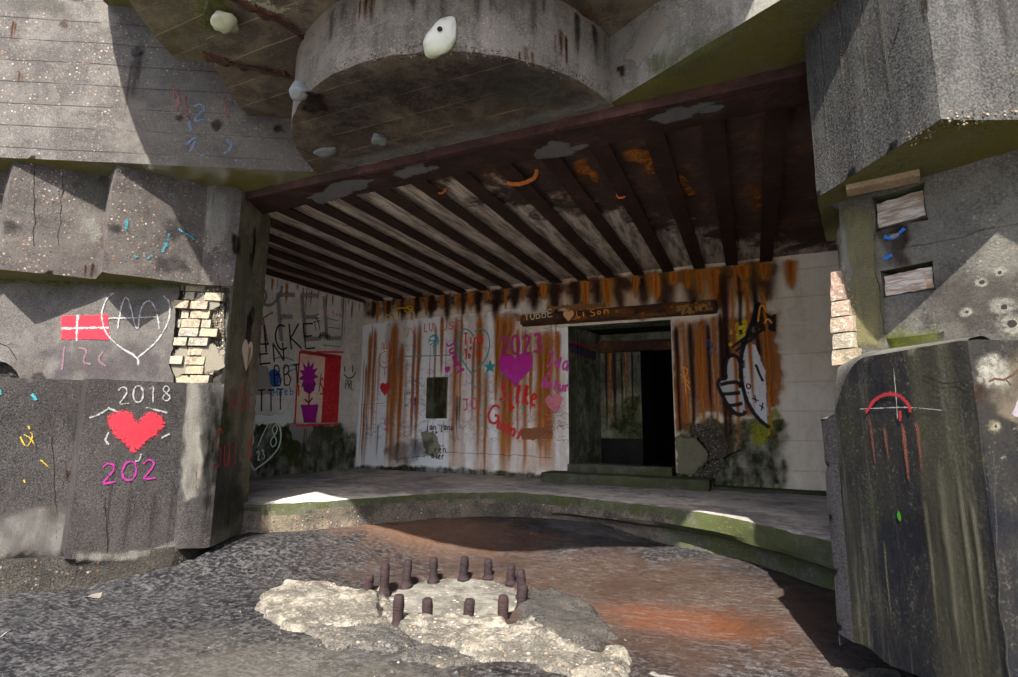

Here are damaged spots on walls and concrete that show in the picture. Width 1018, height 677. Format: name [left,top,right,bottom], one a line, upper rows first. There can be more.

corrosion [559,31,568,63]
peeling [534,140,589,159]
corrosion [623,149,656,174]
peeling [647,101,725,125]
spalling [990,298,1018,336]
spalling [169,285,226,500]
corrosion [271,260,796,469]
peeling [977,354,1018,431]
spalling [675,424,728,478]
water stain [926,515,936,603]
water stain [938,467,959,639]
water stain [957,476,989,640]